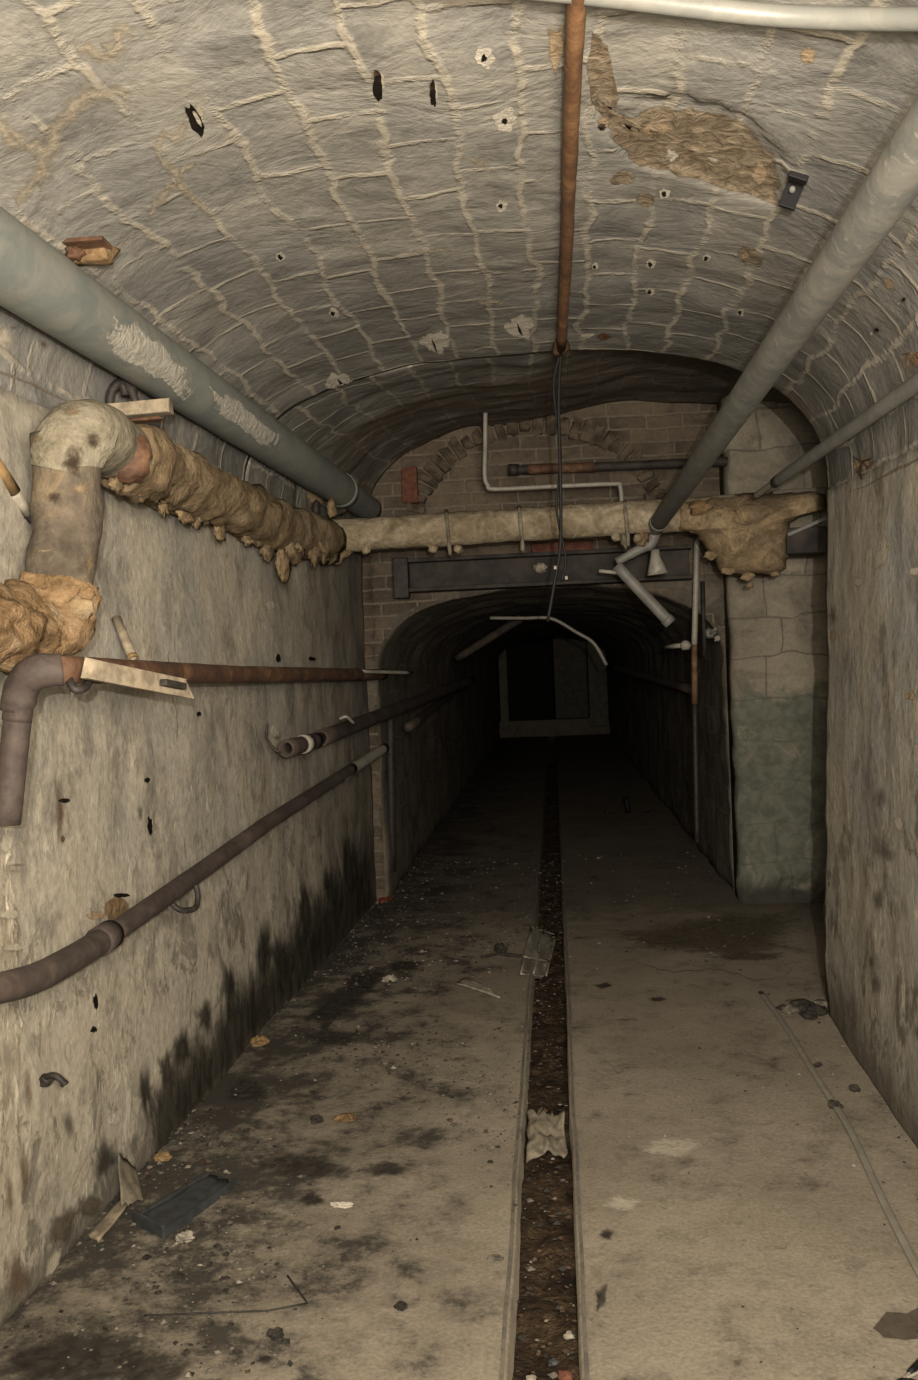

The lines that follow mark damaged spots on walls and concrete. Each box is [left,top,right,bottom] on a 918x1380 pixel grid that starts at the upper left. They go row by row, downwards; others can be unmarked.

spalling [587,32,781,207]
damp [141,839,376,1152]
damp [306,961,419,1045]
damp [260,1154,339,1176]
damp [301,1193,323,1205]
damp [371,1162,401,1175]